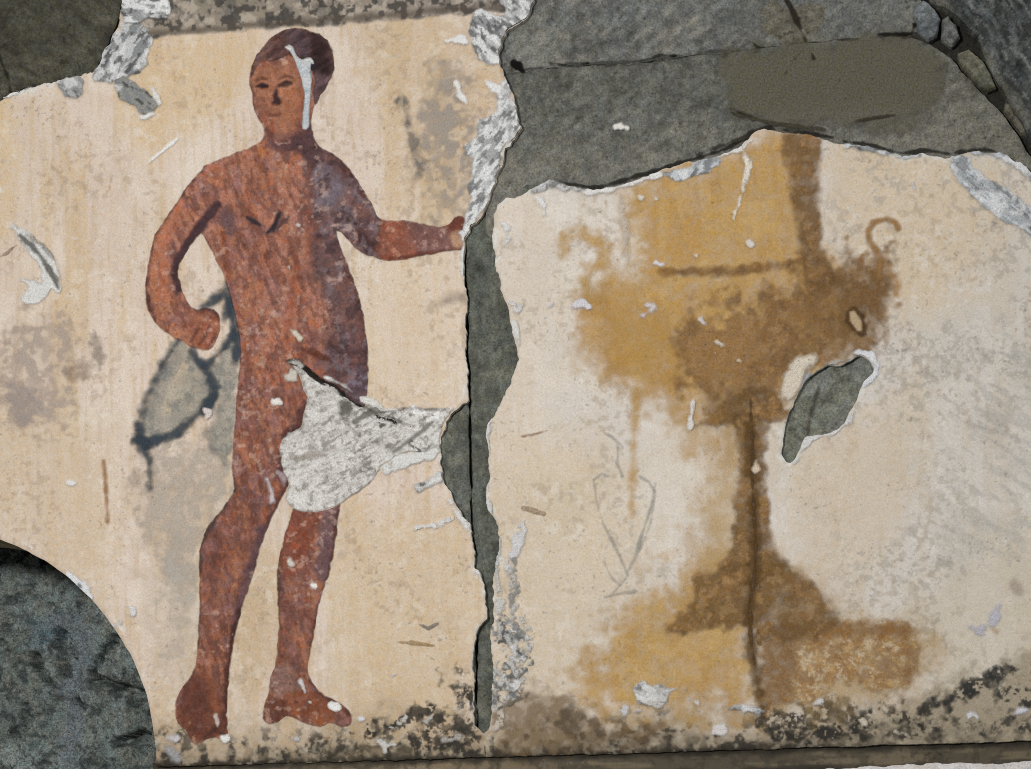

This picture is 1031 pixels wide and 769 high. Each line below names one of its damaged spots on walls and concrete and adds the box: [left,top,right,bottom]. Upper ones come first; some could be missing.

flaking render [56,0,171,119]
peeling [286,45,313,129]
flaking render [445,0,533,65]
flaking render [459,79,521,275]
flaking render [531,139,753,257]
flaking render [949,151,1031,236]
leakage [581,133,809,426]
flaking render [265,359,453,512]
leakage [581,449,753,725]
mould [344,667,481,760]
leakage [492,691,594,754]
leakage [746,653,1031,746]